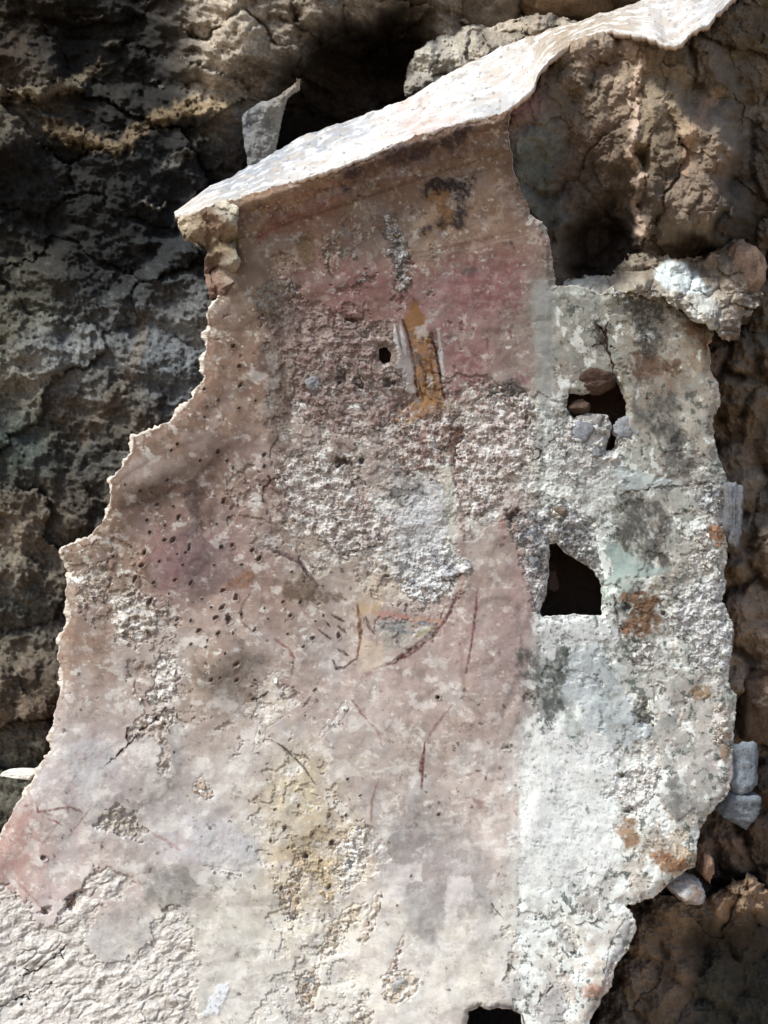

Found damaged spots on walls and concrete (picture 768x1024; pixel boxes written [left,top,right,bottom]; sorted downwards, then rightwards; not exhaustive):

spalling [253,276,607,623]
spalling [549,367,640,480]
crack [110,707,170,762]
spalling [0,866,201,1024]